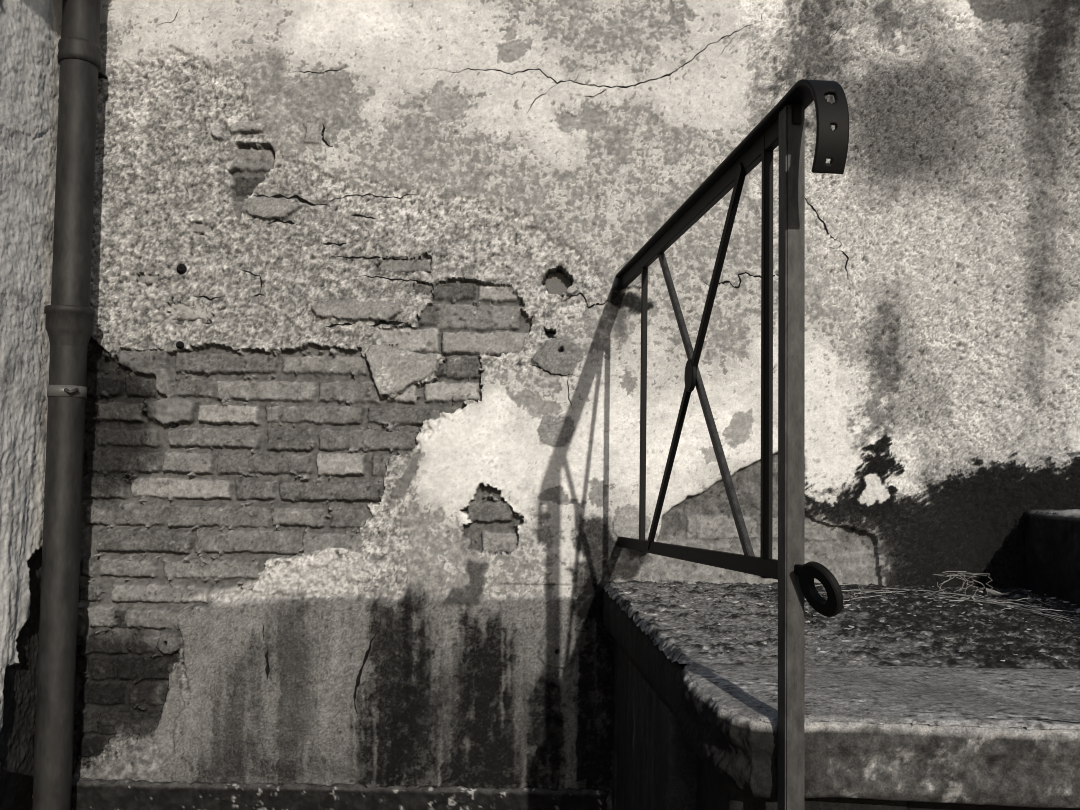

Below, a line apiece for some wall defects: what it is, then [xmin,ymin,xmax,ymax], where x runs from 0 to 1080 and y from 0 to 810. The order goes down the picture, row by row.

crack [423,5,771,113]
spalling [228,141,275,218]
spalling [72,252,564,774]
damp [268,605,309,784]
damp [351,514,647,795]